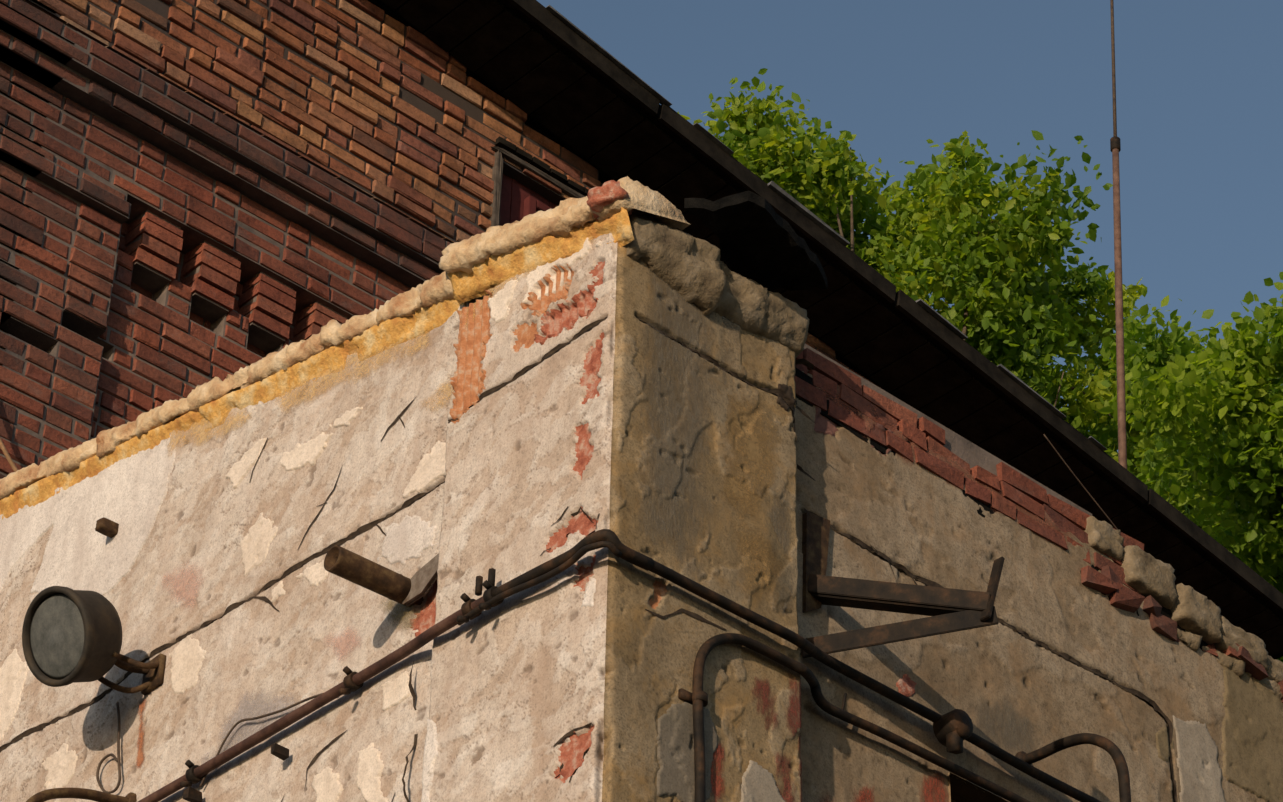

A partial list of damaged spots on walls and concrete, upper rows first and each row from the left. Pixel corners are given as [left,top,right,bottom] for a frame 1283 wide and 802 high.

spalling [449,238,605,424]
peeling [0,430,177,595]
peeling [401,441,446,499]
spalling [540,506,598,556]
crack [448,317,944,588]
peeling [0,649,29,742]
peeling [41,743,78,790]
peeling [168,633,206,694]
crack [0,465,445,752]
spalling [553,722,594,783]
crack [645,608,726,630]
crack [998,618,1177,802]